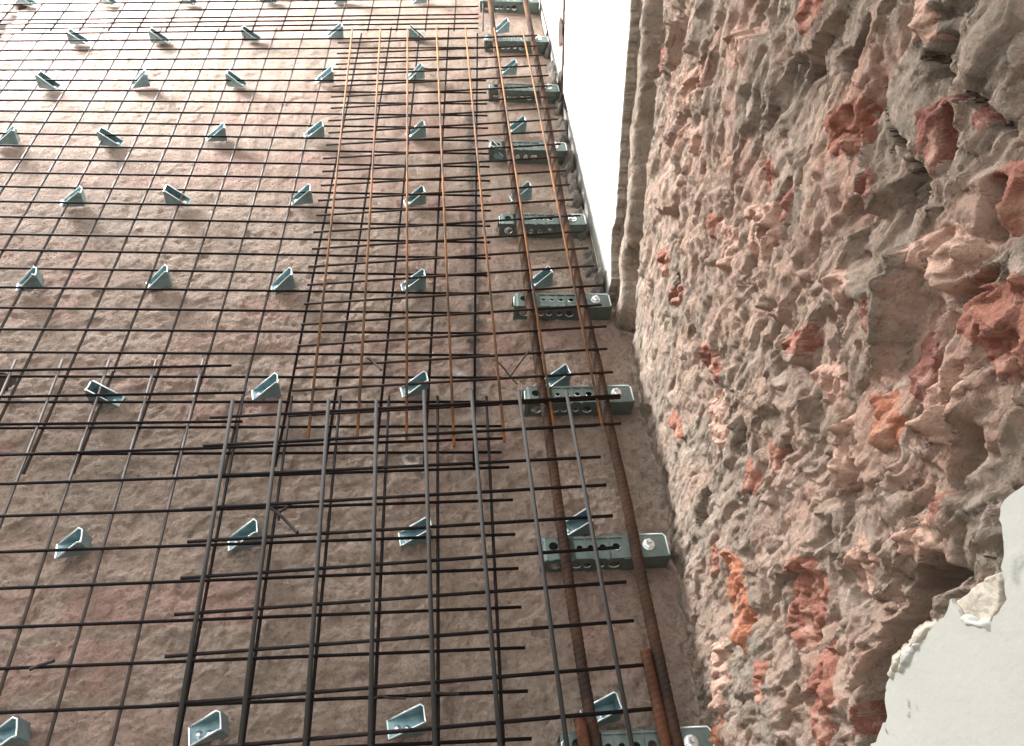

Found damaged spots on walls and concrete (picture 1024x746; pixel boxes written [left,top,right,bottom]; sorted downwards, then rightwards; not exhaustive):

spalling [540,0,1024,746]